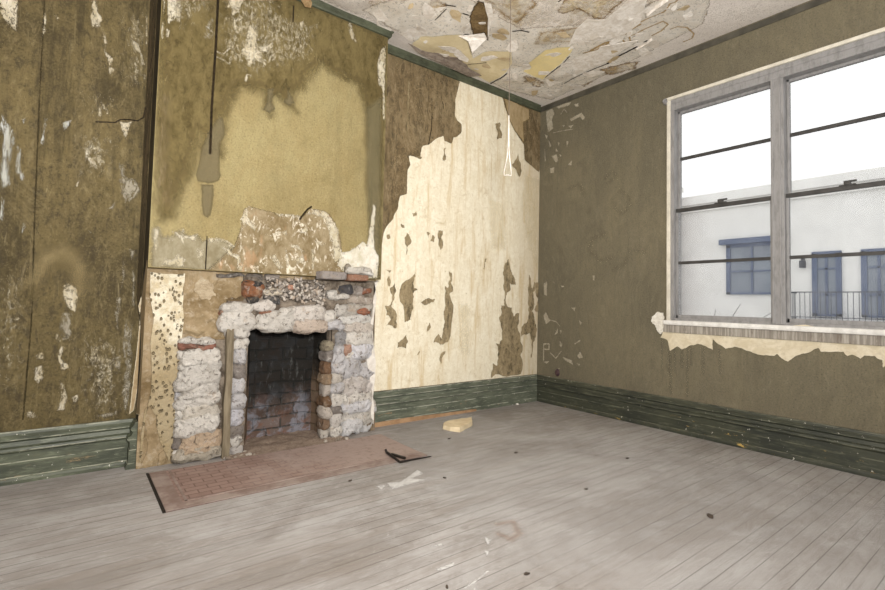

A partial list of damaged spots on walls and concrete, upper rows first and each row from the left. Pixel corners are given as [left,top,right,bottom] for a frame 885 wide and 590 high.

peeling [0,0,18,31]
crack [96,107,146,123]
damp [152,0,387,279]
flaking render [326,0,710,391]
flaking render [194,206,342,300]
flaking render [651,312,885,367]